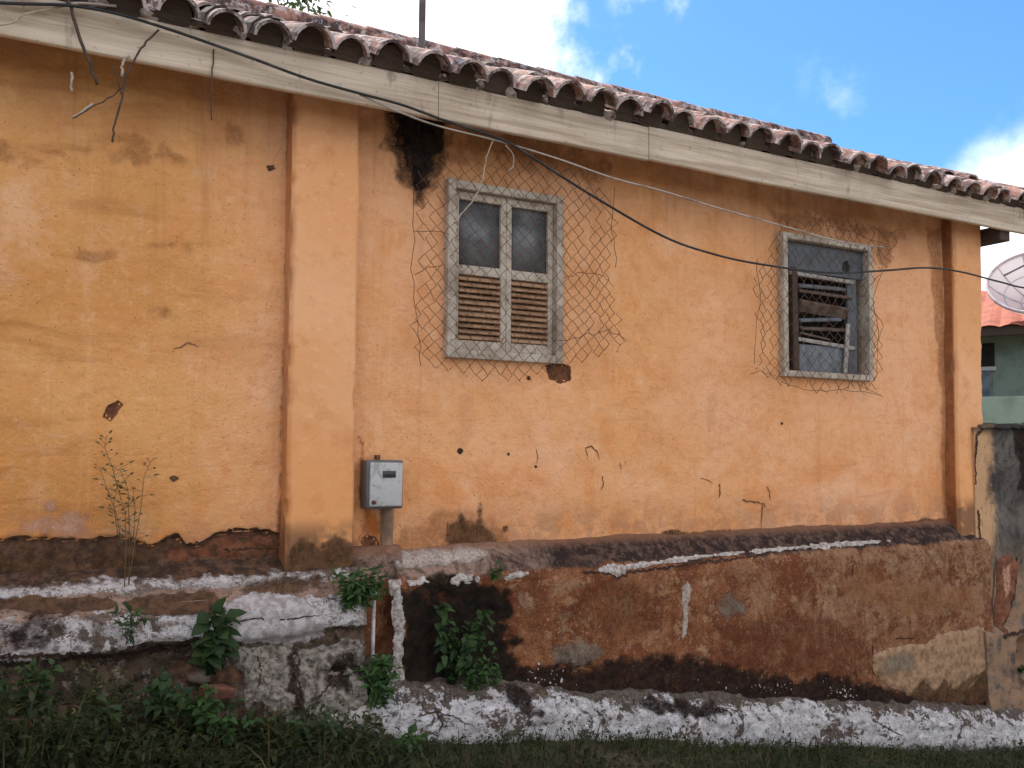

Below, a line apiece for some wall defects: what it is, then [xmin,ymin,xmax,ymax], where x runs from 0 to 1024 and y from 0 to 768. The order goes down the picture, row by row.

damp [431,121,444,153]
spalling [546,364,571,384]
damp [1013,428,1024,490]
spalling [0,528,280,574]
damp [395,505,508,568]
peeling [992,554,1018,635]
damp [7,611,62,650]
crack [224,614,376,739]
damp [507,652,988,705]